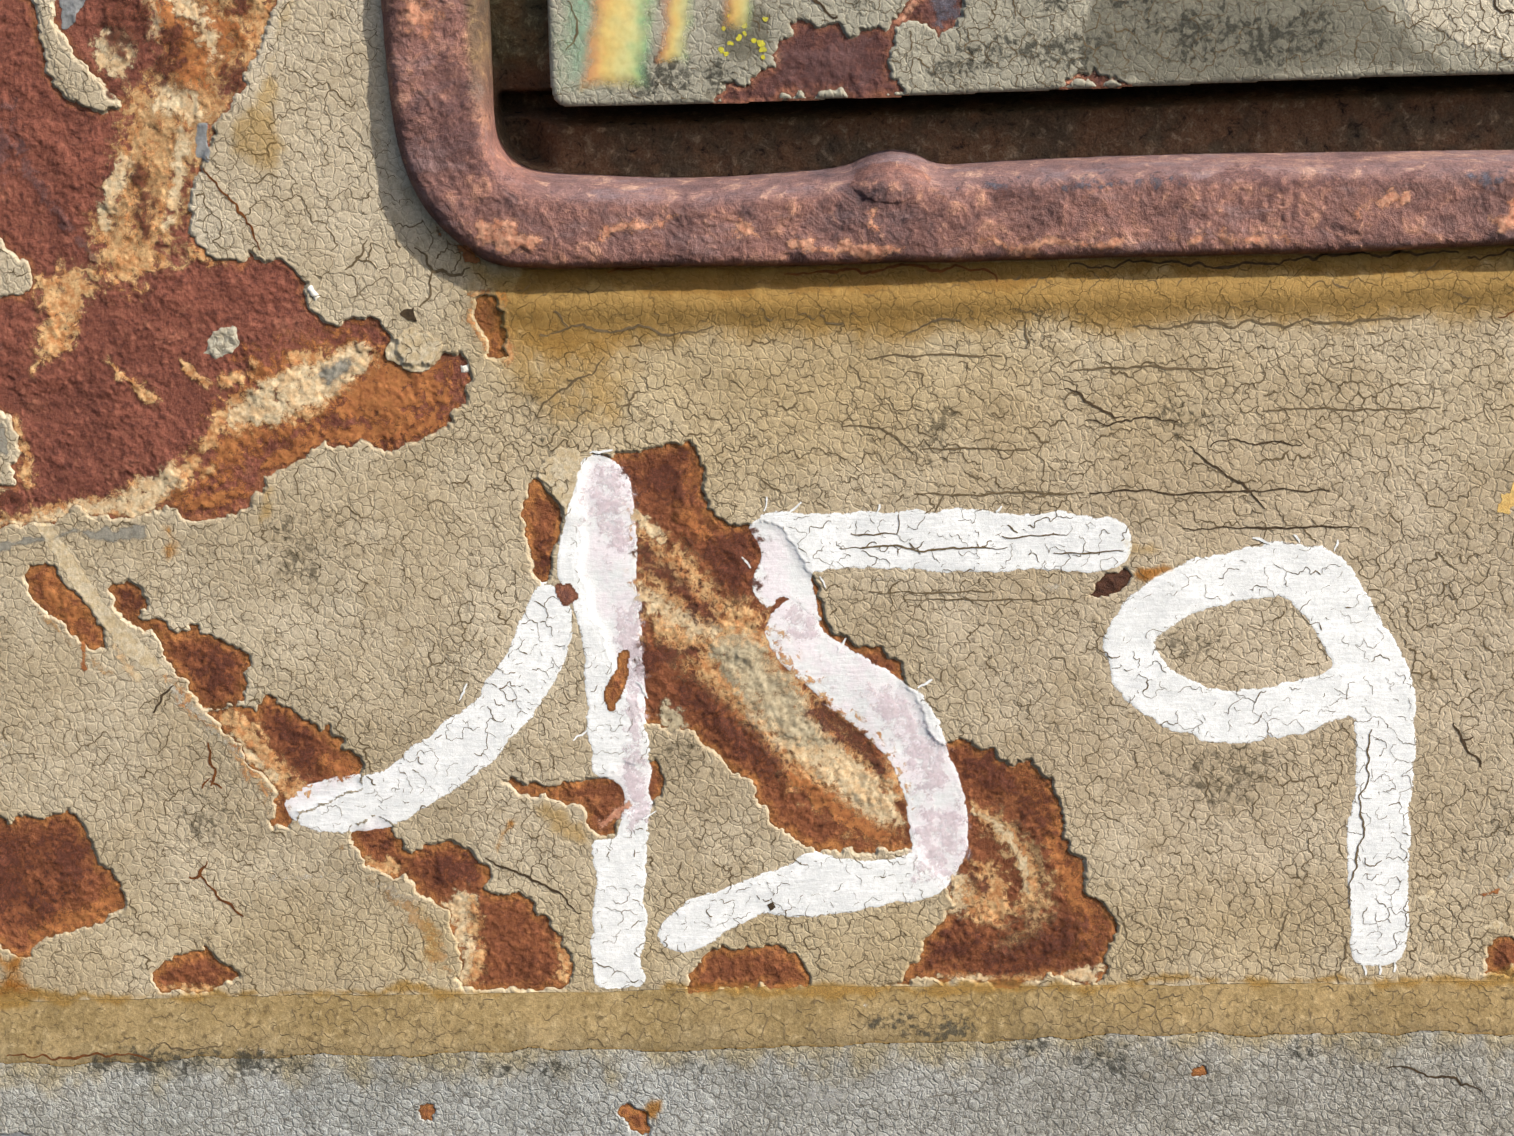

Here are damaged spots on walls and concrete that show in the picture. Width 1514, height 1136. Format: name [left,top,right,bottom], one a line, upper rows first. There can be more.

crack [39,0,88,101]
rust [710,0,962,104]
crack [555,0,1514,101]
rust [0,0,471,529]
peeling [385,307,443,372]
rust [108,581,363,828]
rust [593,441,916,854]
rust [0,810,125,958]
rust [341,826,573,994]
rust [506,777,632,836]
rust [877,738,1117,989]
water stain [852,1005,975,1041]